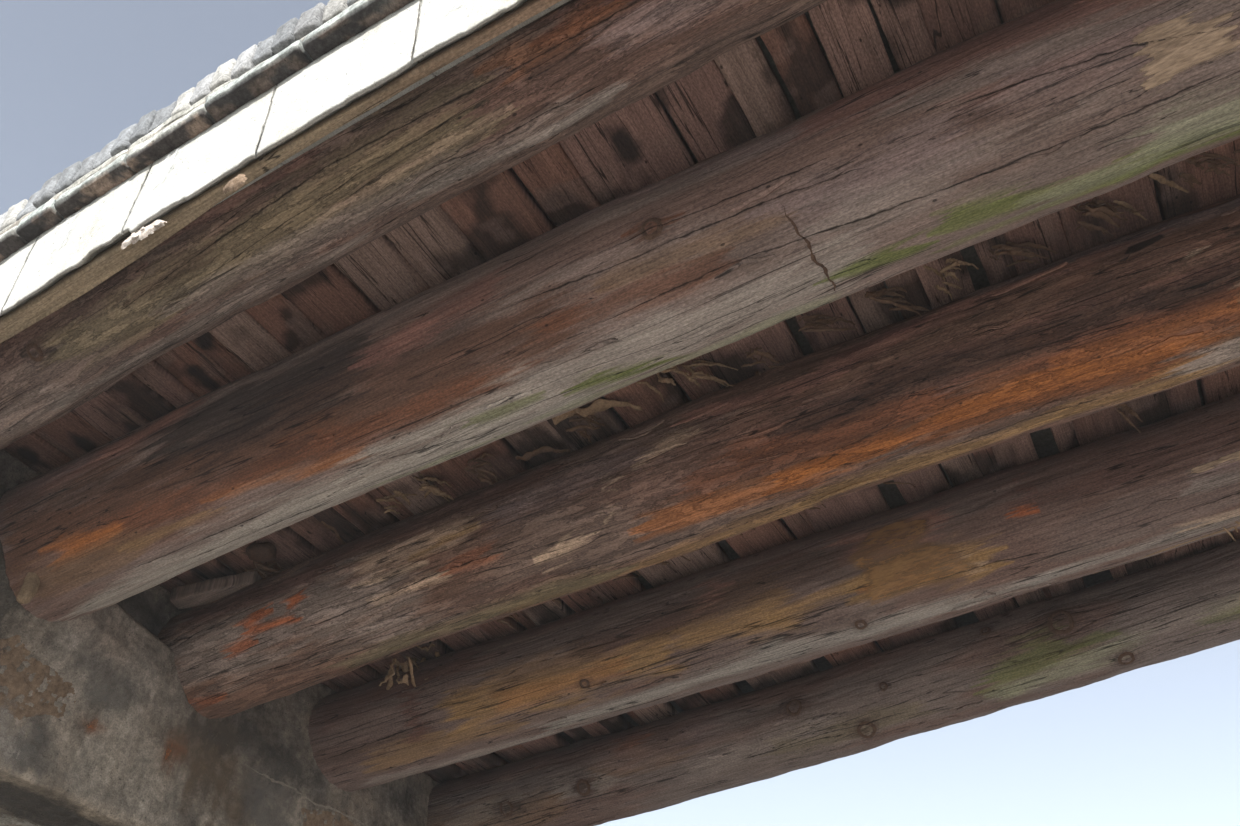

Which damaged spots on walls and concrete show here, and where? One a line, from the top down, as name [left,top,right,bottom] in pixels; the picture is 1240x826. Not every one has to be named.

crack [782,205,836,291]
leakage [0,782,97,826]